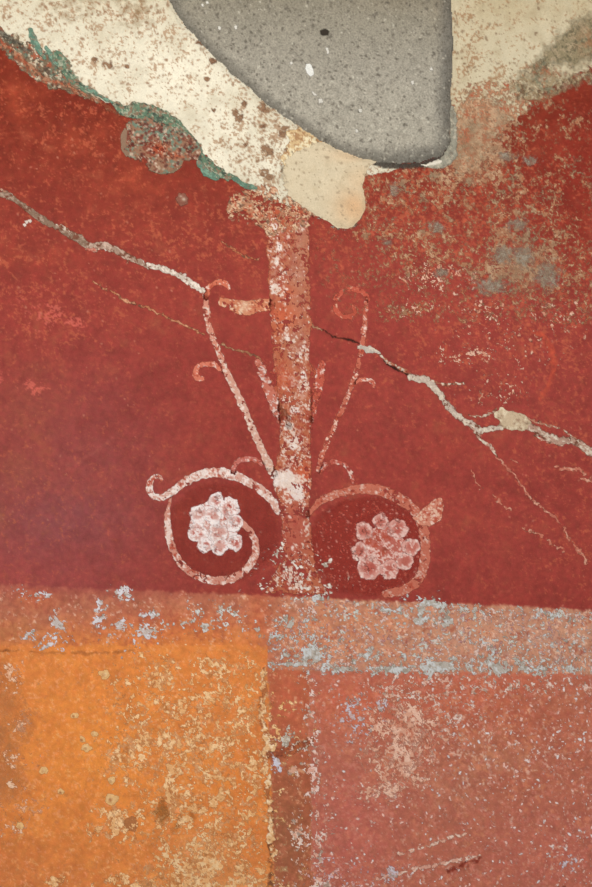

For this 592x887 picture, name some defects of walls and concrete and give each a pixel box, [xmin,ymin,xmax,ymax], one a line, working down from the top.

flaking render [0,0,330,207]
flaking render [343,0,592,325]
crack [0,188,206,293]
crack [93,281,261,360]
crack [301,316,592,565]
peeling [2,661,25,694]
peeling [1,750,64,838]
peeling [78,640,335,887]
peeling [44,875,68,887]